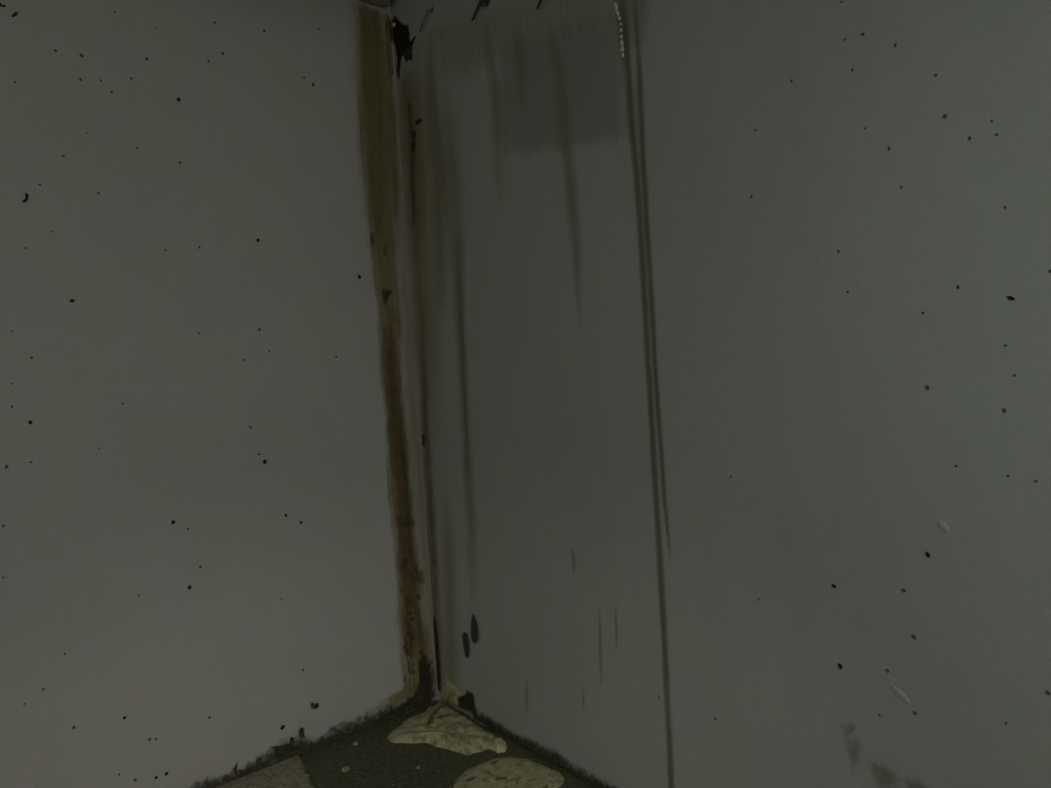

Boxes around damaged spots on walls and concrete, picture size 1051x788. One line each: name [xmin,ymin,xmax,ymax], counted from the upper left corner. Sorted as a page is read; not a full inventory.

corrosion [360,6,441,696]
water stain [194,656,615,788]
water stain [462,614,478,658]
water stain [614,2,673,788]